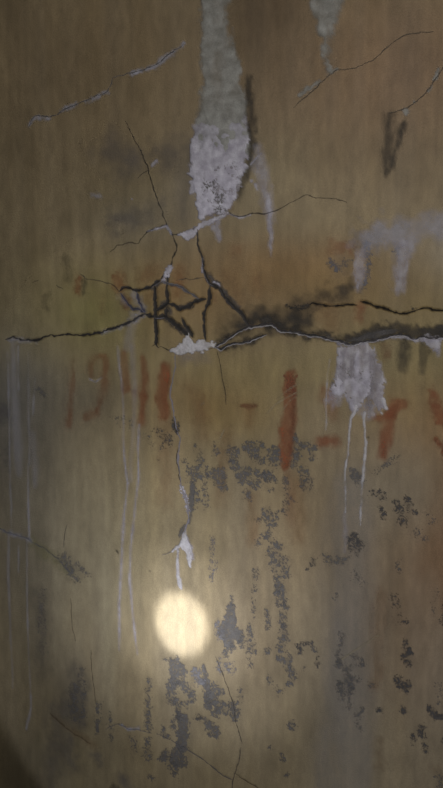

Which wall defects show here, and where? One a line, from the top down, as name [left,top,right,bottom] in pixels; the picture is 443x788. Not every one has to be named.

damp [310,0,343,72]
damp [187,0,257,220]
crack [5,124,443,558]
efflorescence [331,345,388,482]
peeling [182,433,320,698]
peeling [367,488,436,541]
crack [110,658,258,788]
peeling [129,656,243,777]
peeling [393,640,414,693]